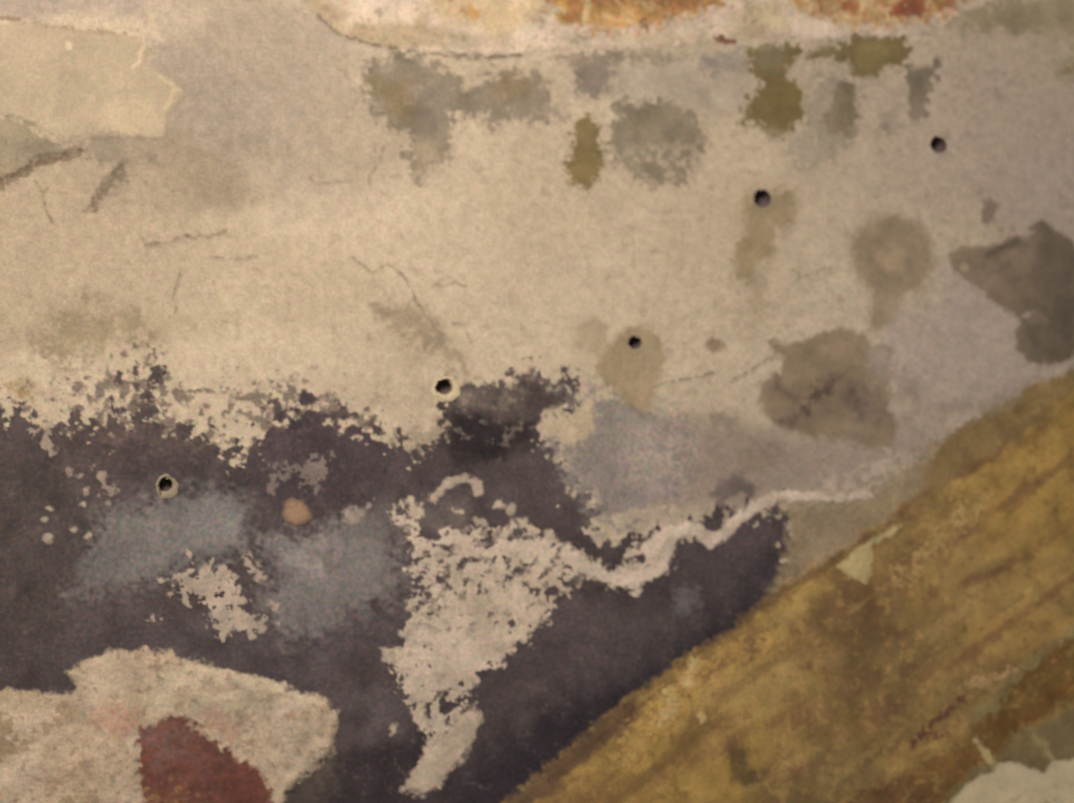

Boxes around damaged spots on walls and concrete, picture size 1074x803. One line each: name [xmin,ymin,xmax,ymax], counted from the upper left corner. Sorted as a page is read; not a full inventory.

corrosion [435,0,486,25]
corrosion [536,0,735,41]
corrosion [771,0,997,34]
water stain [349,27,1074,452]
water stain [706,468,762,511]
spalling [0,644,342,803]
water stain [0,697,353,803]
spalling [947,725,1074,803]